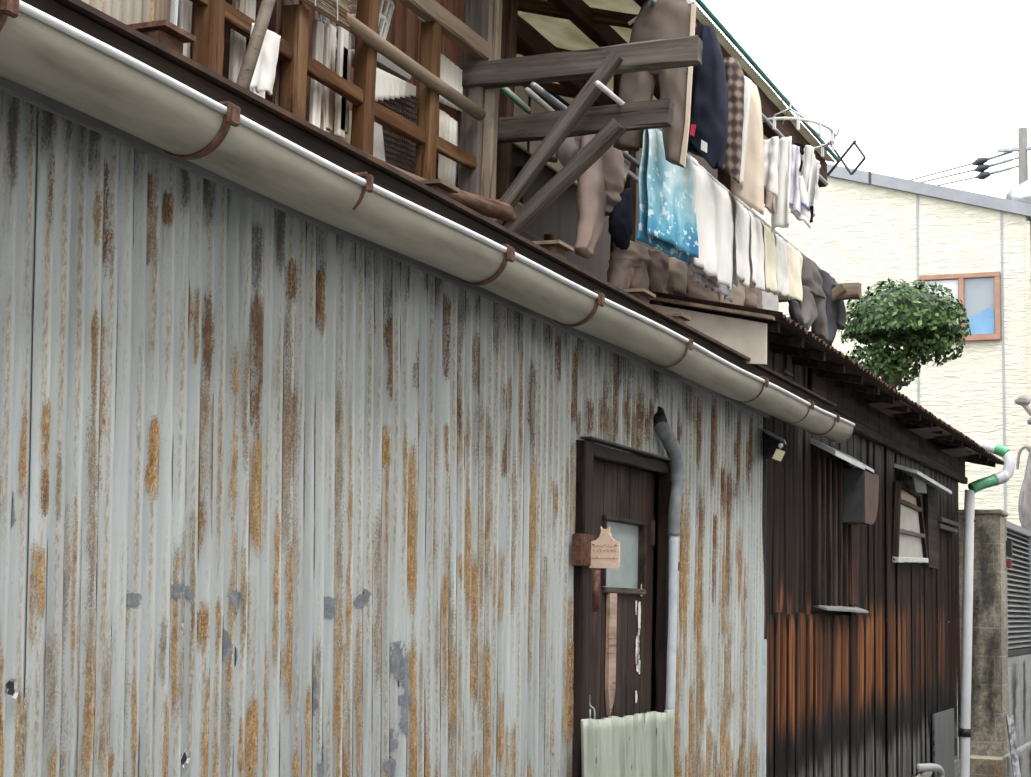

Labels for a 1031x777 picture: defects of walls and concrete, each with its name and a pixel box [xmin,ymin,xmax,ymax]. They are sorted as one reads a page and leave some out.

corrosion [3,92,118,284]
corrosion [146,169,215,268]
corrosion [18,209,659,777]
corrosion [670,386,760,777]
corrosion [0,643,27,777]